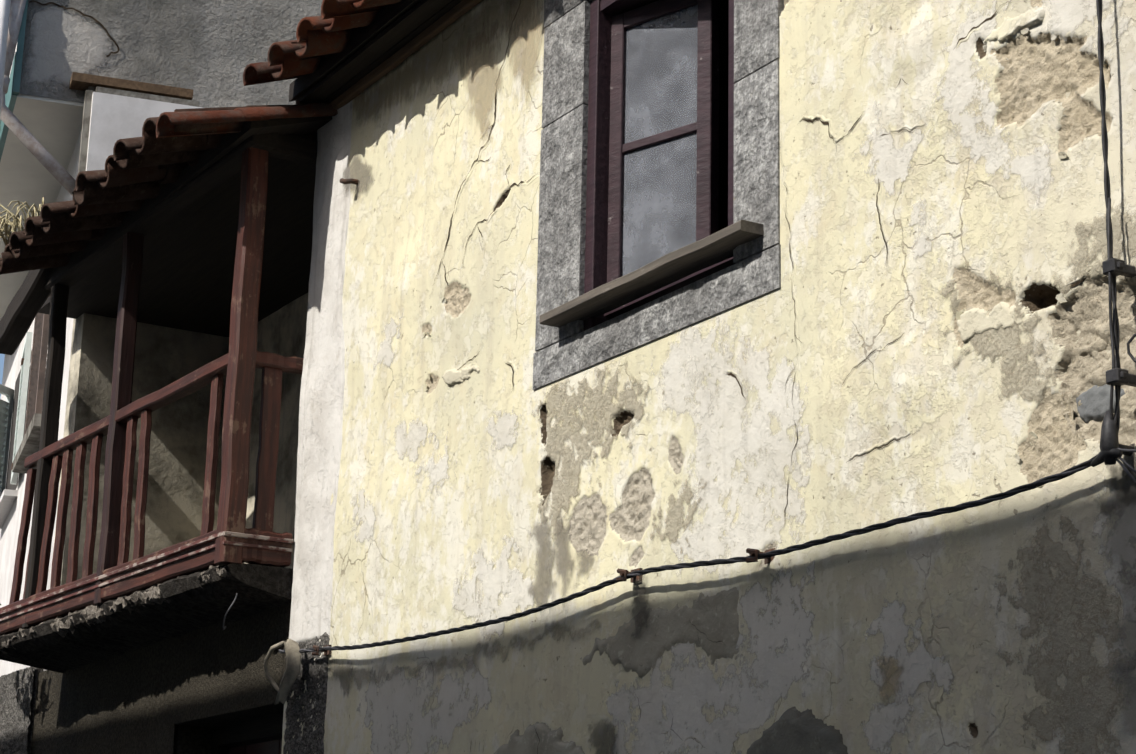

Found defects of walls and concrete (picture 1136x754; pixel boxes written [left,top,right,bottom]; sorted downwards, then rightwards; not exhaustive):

crack [437,0,540,285]
spalling [933,0,1131,203]
spalling [440,281,471,318]
crack [780,110,926,525]
flaking render [940,199,1136,487]
peeling [486,317,811,573]
spalling [0,584,170,654]
spalling [197,564,228,588]
peeling [1090,484,1136,621]
spalling [968,723,978,738]